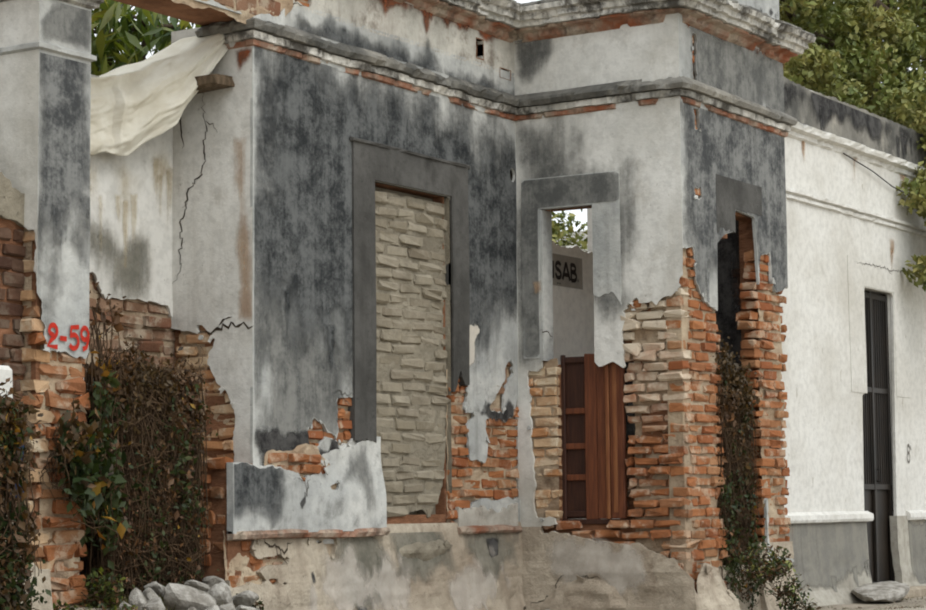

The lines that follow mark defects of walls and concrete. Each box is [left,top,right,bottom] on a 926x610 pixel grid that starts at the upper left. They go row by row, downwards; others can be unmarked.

spalling [172,0,309,24]
leakage [297,17,436,71]
spalling [476,37,484,60]
leakage [38,52,148,292]
spalling [0,218,235,608]
crack [175,93,217,281]
crack [204,317,255,334]
leakage [234,462,284,521]
spalling [264,397,362,490]
leakage [254,46,633,455]
spalling [446,247,729,594]
leakage [684,103,788,379]